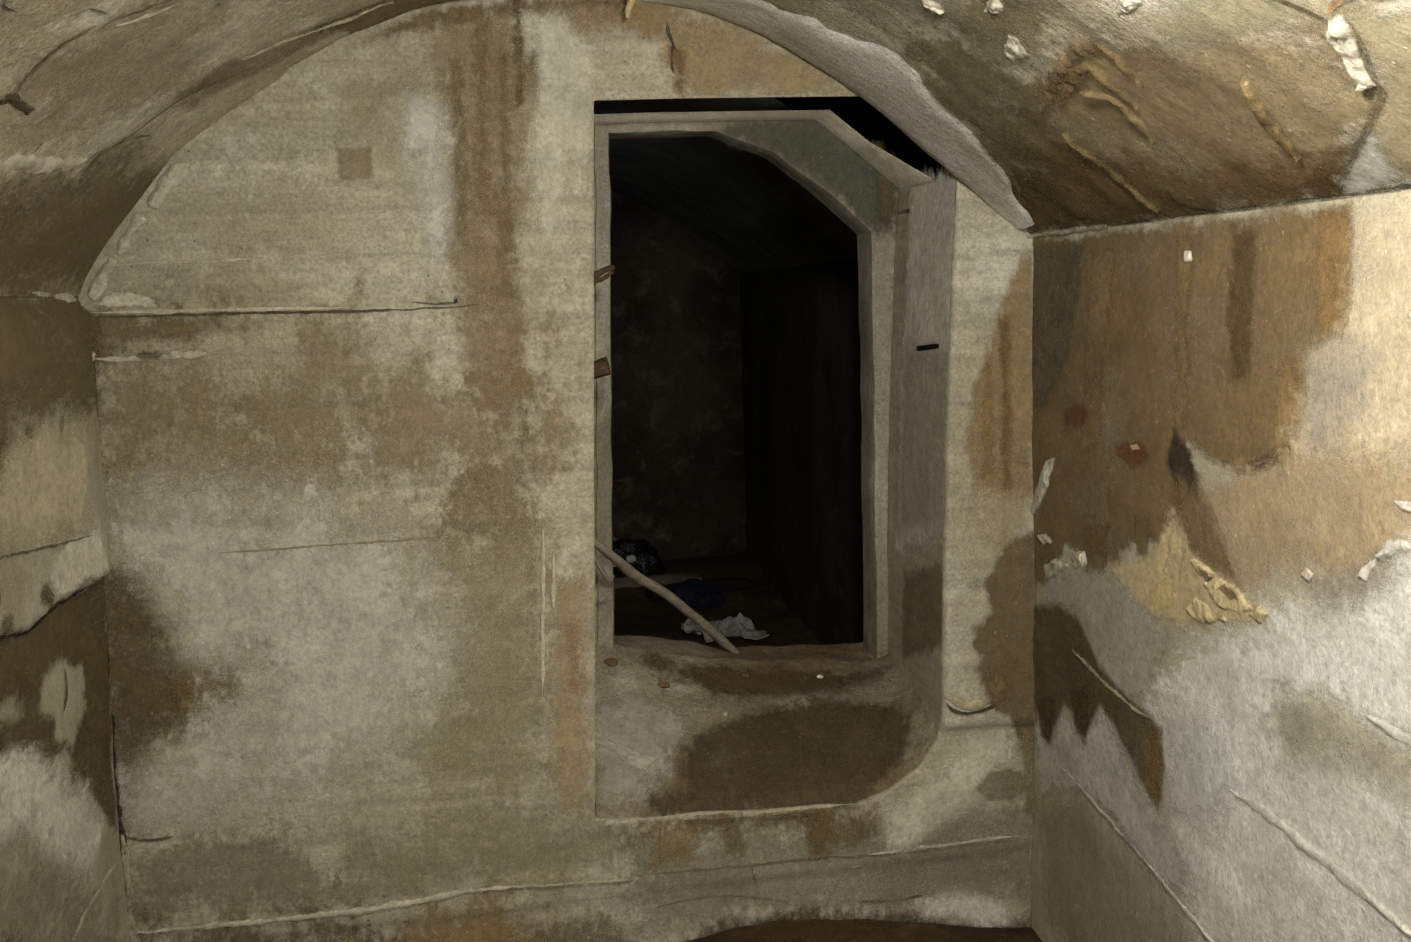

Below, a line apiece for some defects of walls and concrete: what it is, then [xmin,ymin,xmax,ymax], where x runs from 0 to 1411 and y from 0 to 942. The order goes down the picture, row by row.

crack [0,0,178,105]
peeling [922,0,944,15]
peeling [1004,34,1029,61]
flaking render [1326,18,1382,92]
crack [81,67,252,176]
leakage [0,143,225,476]
leakage [968,2,1411,887]
crack [0,535,103,640]
leakage [0,320,573,878]
flaking render [1357,539,1411,581]
crack [111,713,174,867]
leakage [643,653,910,860]